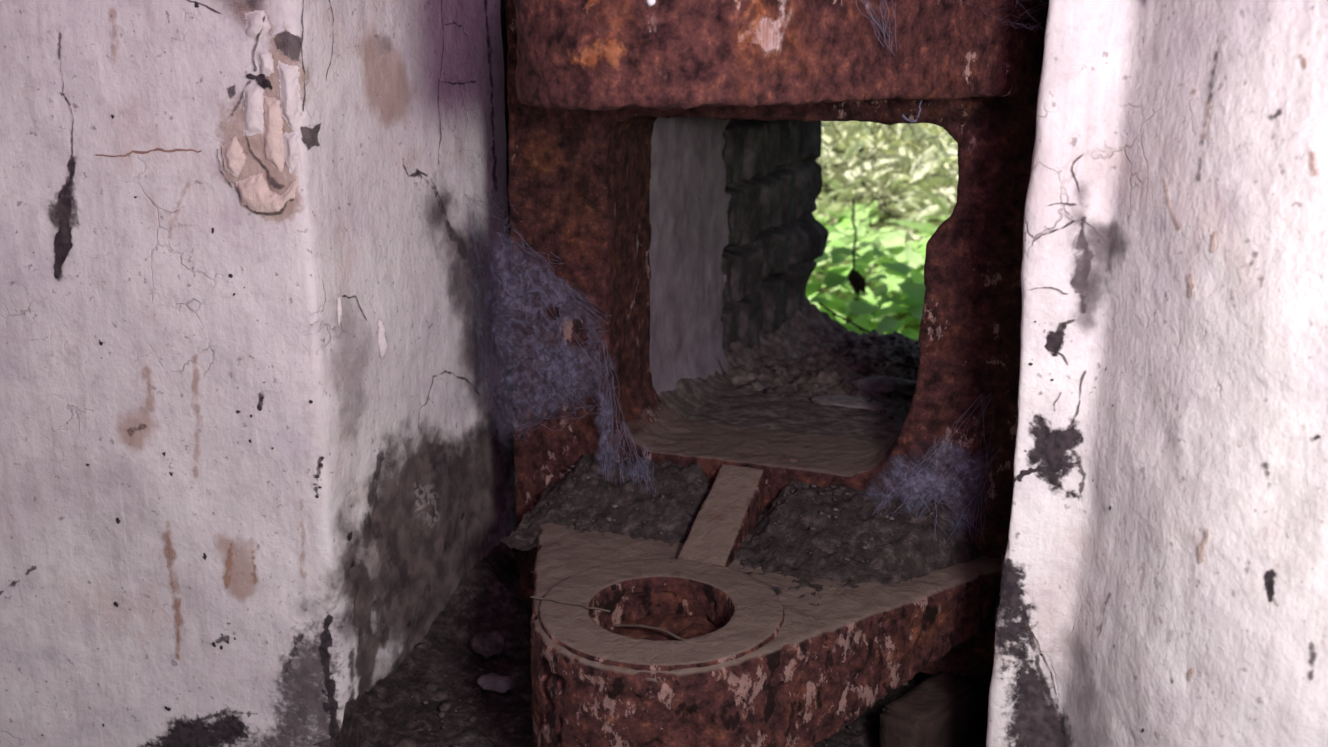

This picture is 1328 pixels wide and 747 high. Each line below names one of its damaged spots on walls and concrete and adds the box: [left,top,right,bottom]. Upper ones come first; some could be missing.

crack [187,0,220,14]
peeling [217,3,321,220]
corrosion [572,39,624,68]
corrosion [738,0,783,48]
water stain [1032,154,1125,332]
corrosion [165,533,181,659]
corrosion [224,544,232,587]
water stain [141,421,514,747]